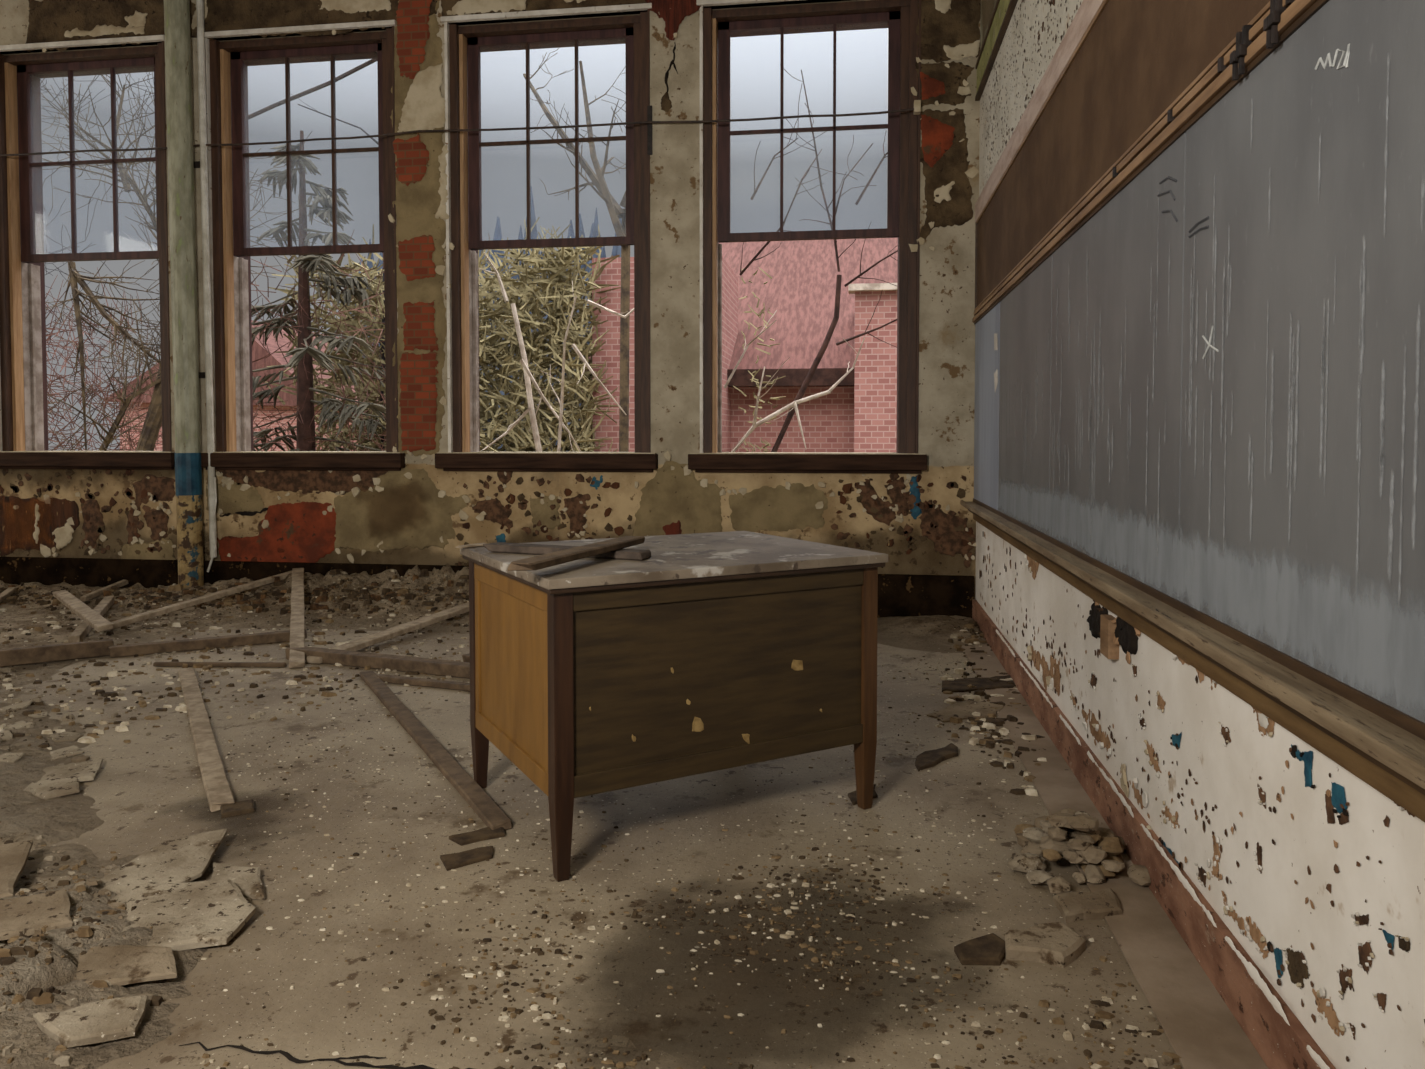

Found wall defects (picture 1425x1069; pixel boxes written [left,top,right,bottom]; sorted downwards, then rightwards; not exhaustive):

peeling [0,469,176,560]
flaking render [206,0,1374,1040]
peeling [1351,899,1410,955]
peeling [1372,993,1401,1013]
crack [179,1042,474,1069]
peeling [1306,1045,1330,1069]